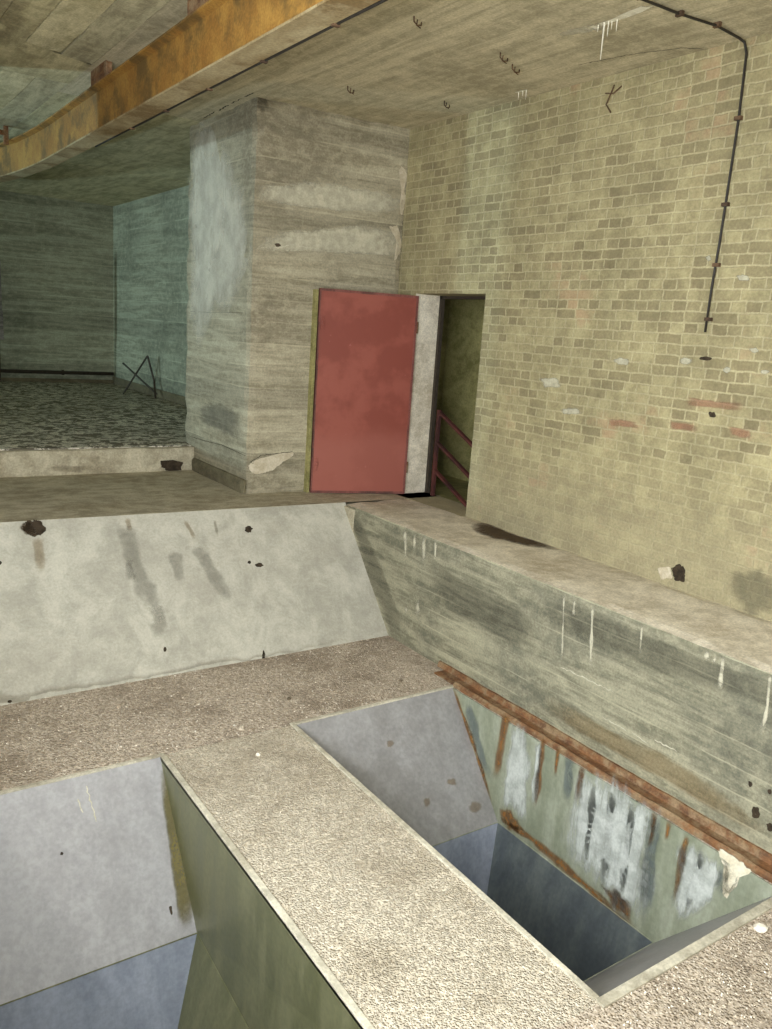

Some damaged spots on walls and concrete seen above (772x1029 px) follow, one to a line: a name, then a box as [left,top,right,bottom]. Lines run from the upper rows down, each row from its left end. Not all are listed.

spalling [248,451,294,474]
spalling [21,519,46,537]
damp [704,653,724,686]
damp [763,677,771,726]
corrosion [455,693,509,790]
corrosion [535,740,559,798]
corrosion [501,810,629,918]
corrosion [675,839,687,894]
peeling [719,849,752,898]